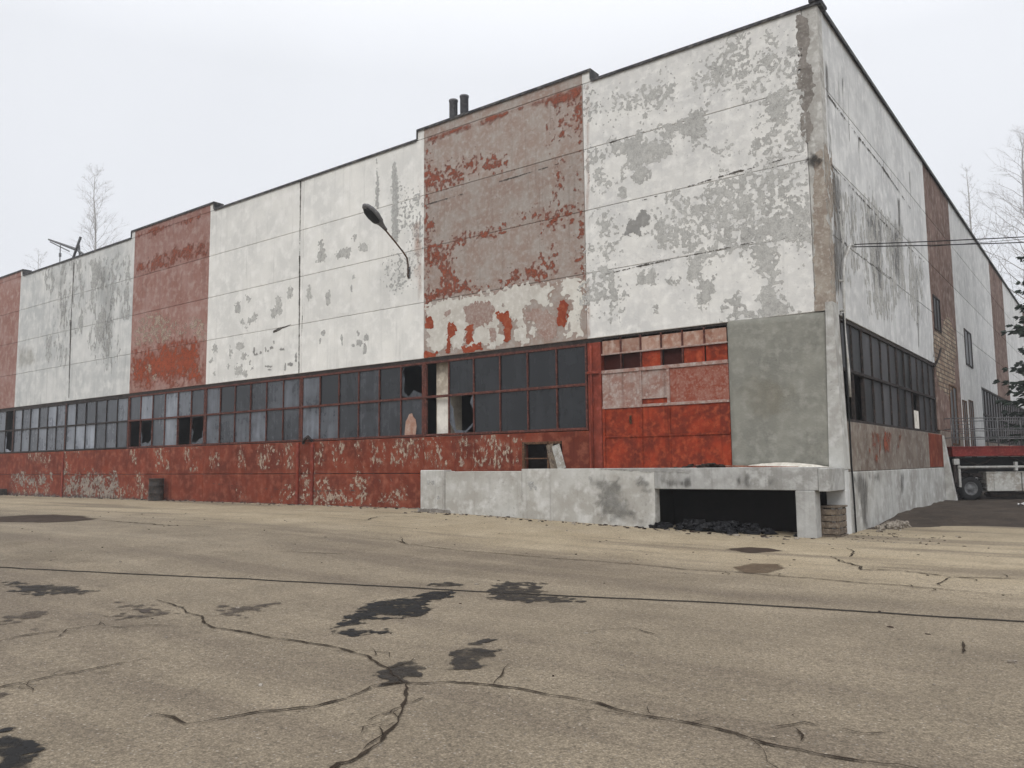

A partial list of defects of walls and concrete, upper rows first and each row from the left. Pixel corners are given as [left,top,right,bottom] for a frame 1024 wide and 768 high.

peeling [375,14,924,358]
peeling [317,234,368,262]
damp [833,173,844,291]
damp [867,200,900,284]
peeling [44,243,297,389]
peeling [340,331,369,354]
peeling [11,449,148,499]
peeling [239,435,522,506]